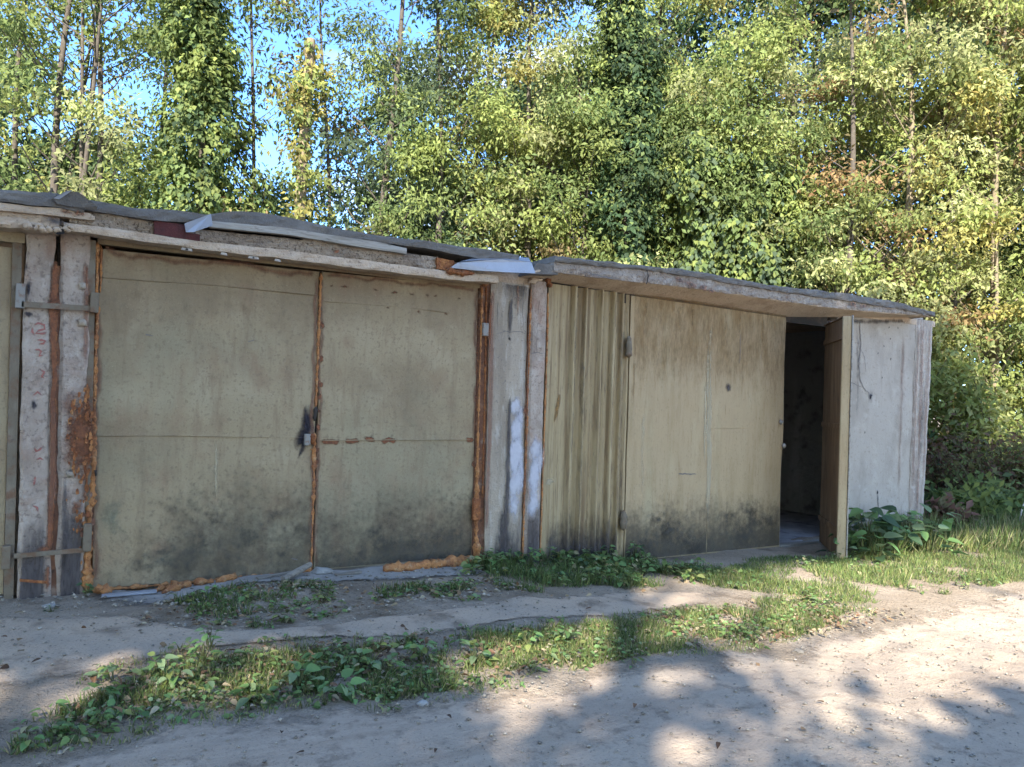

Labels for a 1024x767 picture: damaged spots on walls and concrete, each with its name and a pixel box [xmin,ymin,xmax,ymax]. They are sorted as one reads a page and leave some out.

corrosion [39,262,101,576]
corrosion [107,248,494,561]
water stain [321,514,472,568]
water stain [497,284,527,331]
water stain [495,336,779,564]